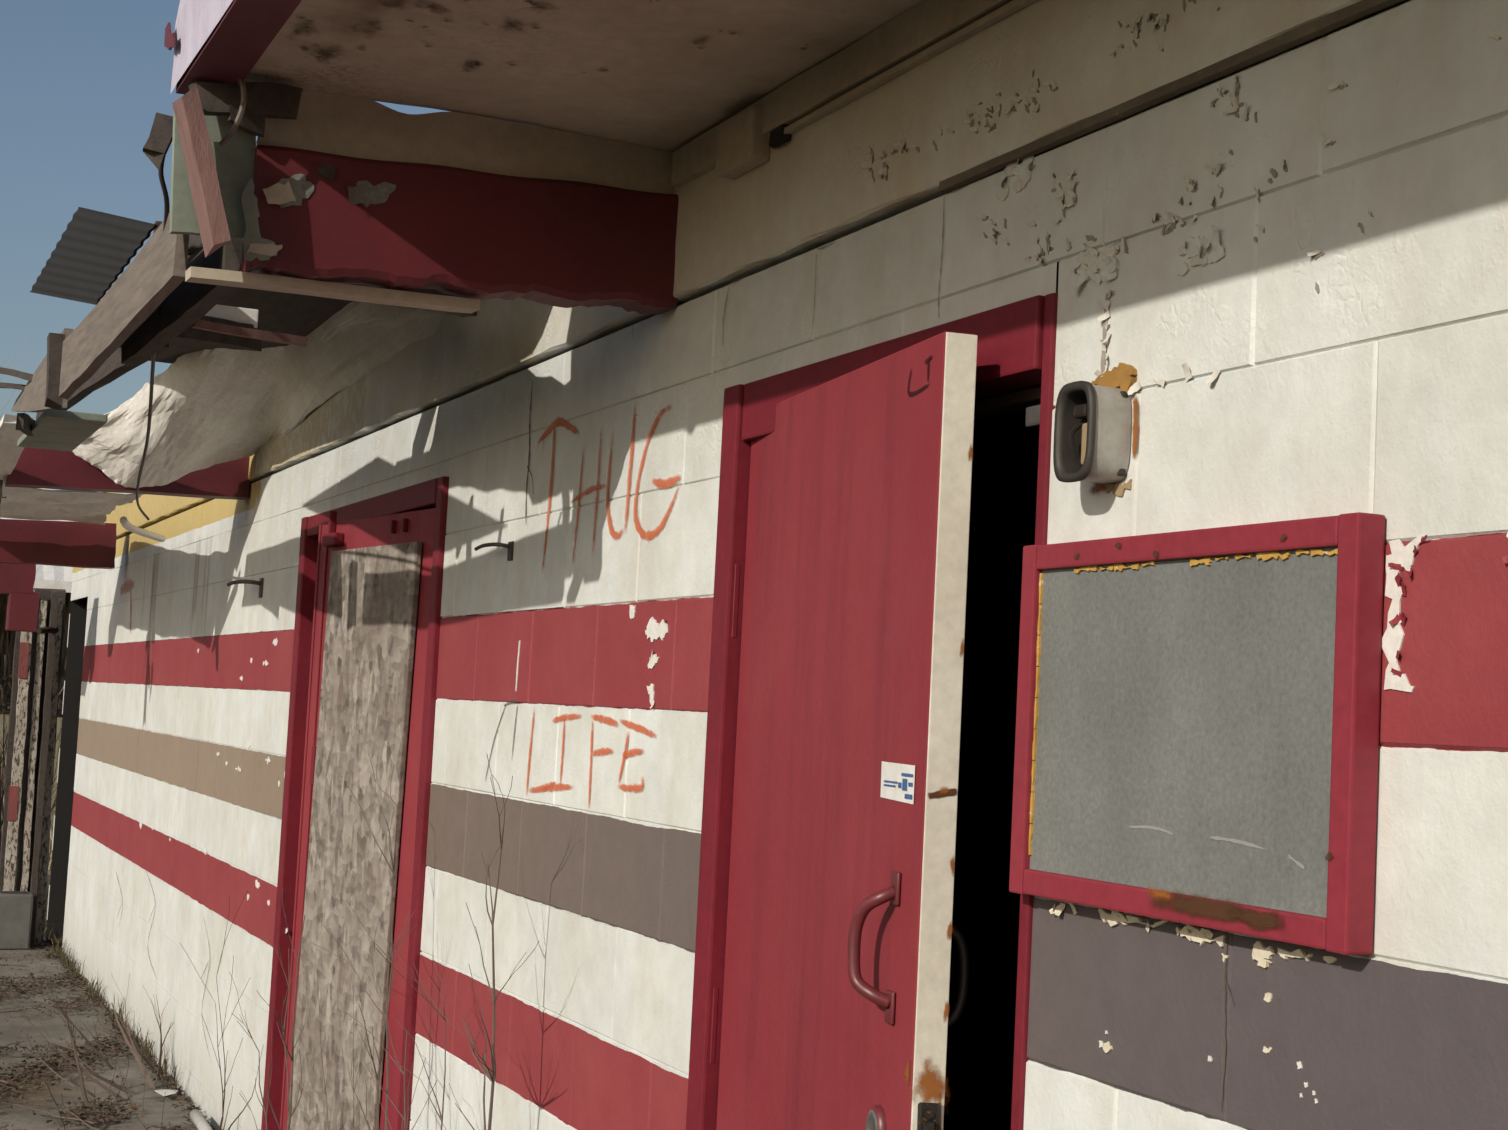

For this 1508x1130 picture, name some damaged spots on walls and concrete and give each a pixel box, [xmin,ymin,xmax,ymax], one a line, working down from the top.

peeling [241,162,396,261]
peeling [1024,168,1128,377]
corrosion [1091,362,1138,457]
corrosion [1091,479,1132,497]
peeling [1382,535,1427,692]
peeling [629,605,668,709]
peeling [1049,902,1077,916]
peeling [1098,908,1229,962]
corrosion [1148,888,1282,930]
peeling [1252,941,1337,968]
peeling [1099,1031,1113,1053]
corrosion [905,1061,945,1130]